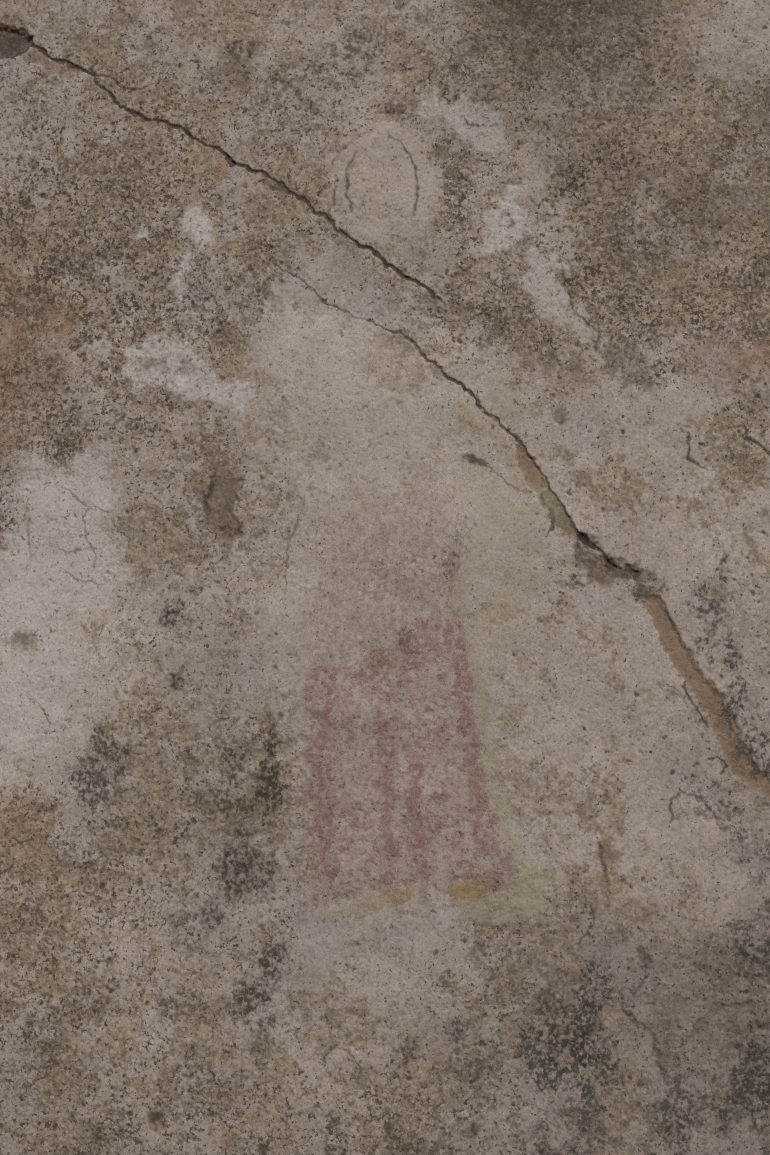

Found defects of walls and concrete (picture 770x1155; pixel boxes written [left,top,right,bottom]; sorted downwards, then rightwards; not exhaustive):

crack [31,35,453,310]
crack [287,271,770,799]